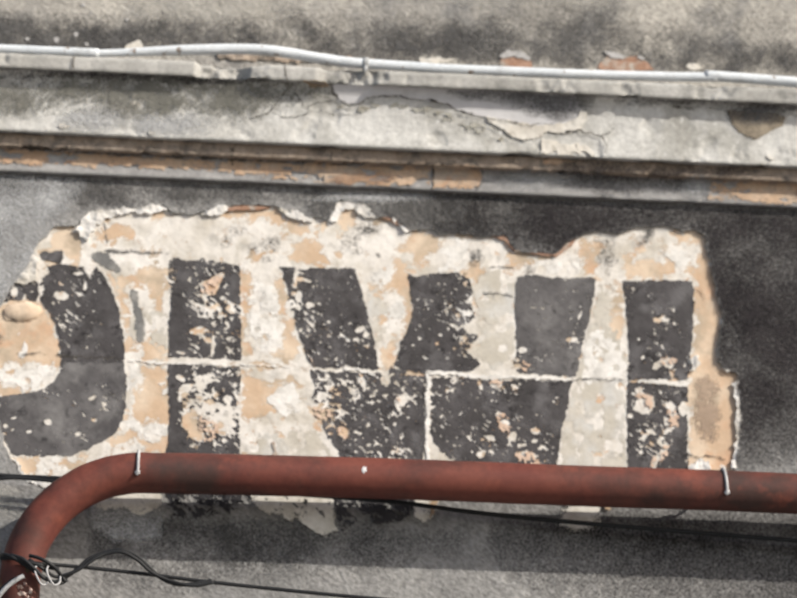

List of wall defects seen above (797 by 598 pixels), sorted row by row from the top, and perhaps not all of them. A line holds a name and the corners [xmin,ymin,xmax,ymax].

water stain [0,0,797,76]
flaking render [499,49,532,68]
flaking render [598,51,654,71]
flaking render [303,80,595,166]
flaking render [727,110,785,139]
peeling [0,147,482,189]
peeling [707,181,797,205]
flaking render [0,199,743,489]